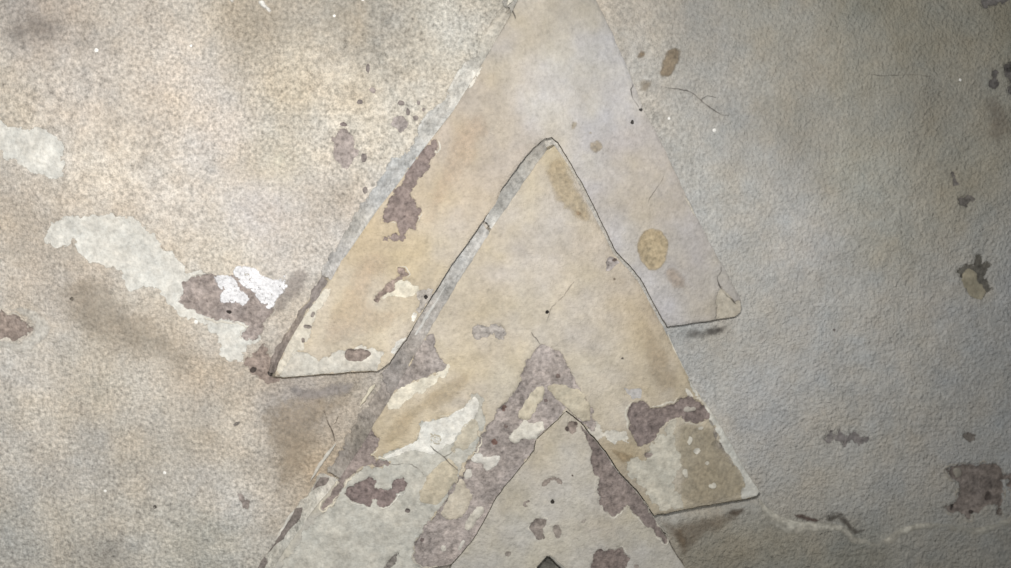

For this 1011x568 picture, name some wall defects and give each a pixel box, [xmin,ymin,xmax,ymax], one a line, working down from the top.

spalling [989,62,1011,94]
spalling [331,122,367,169]
spalling [383,140,441,242]
peeling [44,213,406,384]
spalling [957,254,993,300]
spalling [0,306,34,344]
peeling [282,334,1011,568]